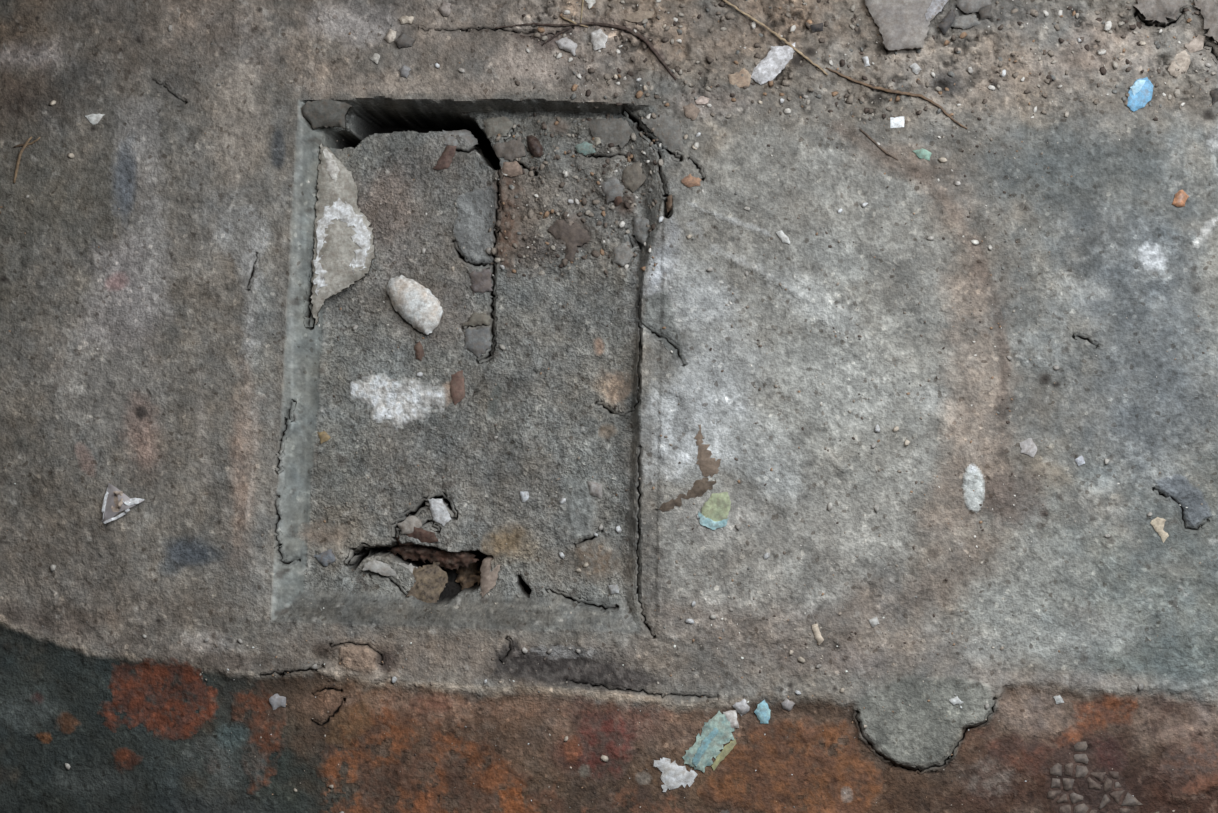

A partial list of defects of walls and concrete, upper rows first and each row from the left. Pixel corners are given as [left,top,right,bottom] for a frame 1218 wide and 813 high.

peeling [913,148,932,161]
crack [612,231,641,266]
crack [595,293,686,419]
crack [272,401,299,567]
spalling [271,96,887,813]
spalling [1020,438,1037,458]
crack [546,447,655,639]
rust [977,693,1139,777]
rust [1156,736,1218,795]